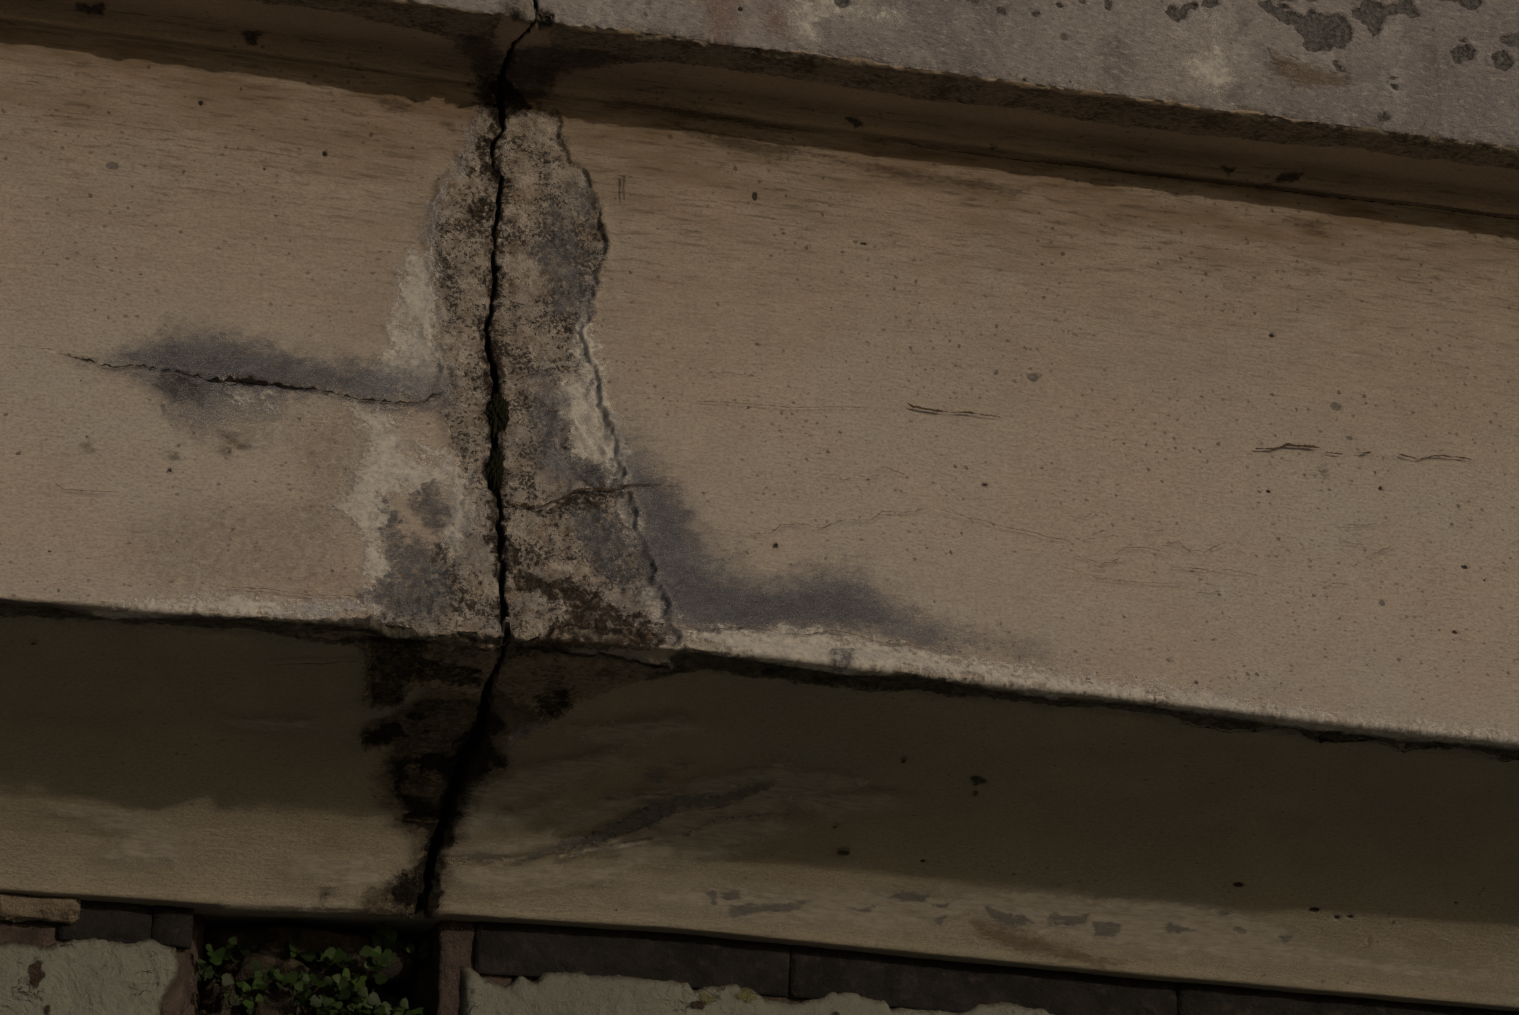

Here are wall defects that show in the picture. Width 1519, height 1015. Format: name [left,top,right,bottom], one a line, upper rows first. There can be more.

crack [7,0,538,456]
water stain [91,247,477,623]
water stain [361,691,800,919]
crack [399,483,774,914]